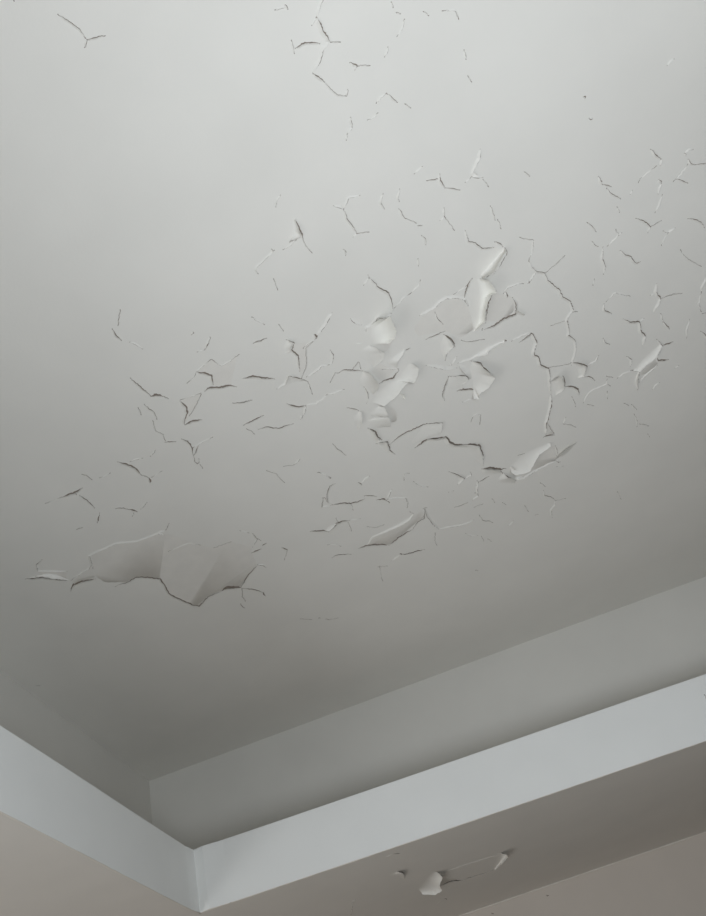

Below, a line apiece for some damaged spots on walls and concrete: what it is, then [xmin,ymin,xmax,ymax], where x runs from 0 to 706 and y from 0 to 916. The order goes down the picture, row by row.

crack [57,14,105,48]
crack [291,0,459,141]
crack [112,309,143,349]
crack [45,378,213,530]
crack [233,375,303,434]
peeling [277,313,345,416]
crack [333,174,578,366]
peeling [348,248,599,485]
peeling [619,339,672,390]
crack [586,148,706,346]
crack [266,459,566,580]
peeling [418,871,461,895]